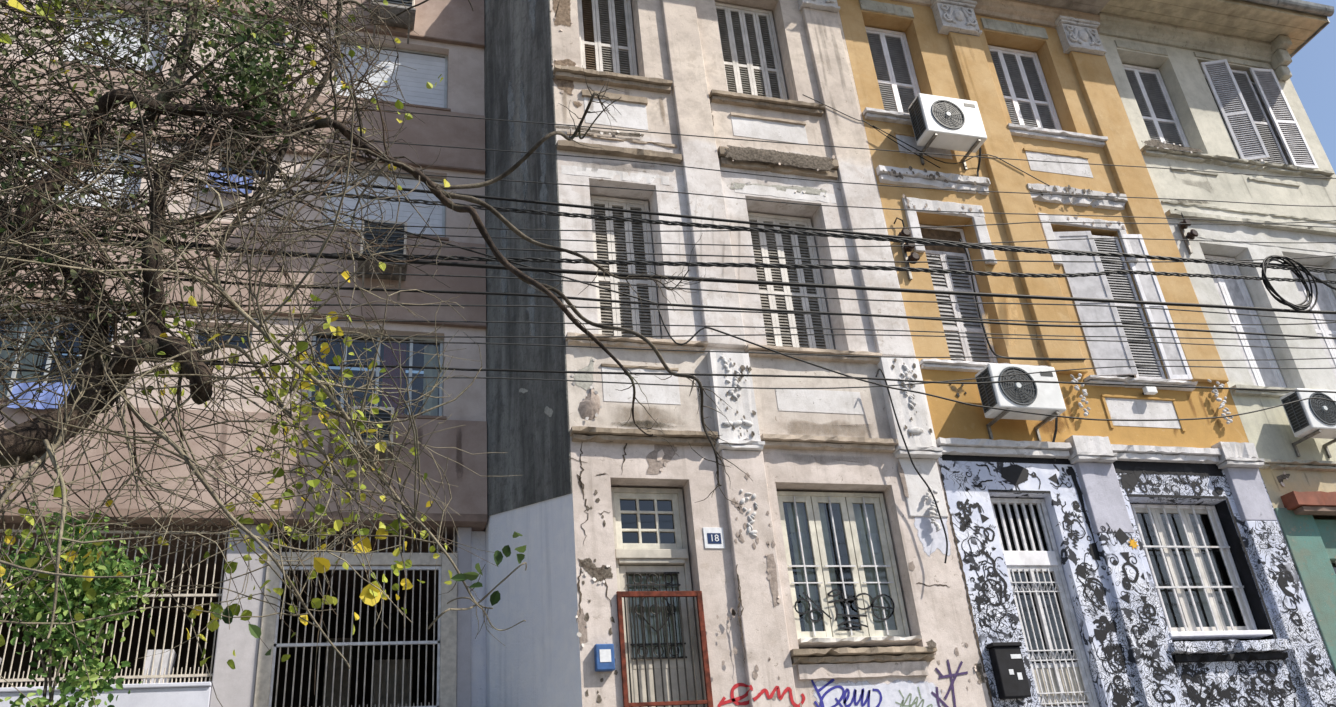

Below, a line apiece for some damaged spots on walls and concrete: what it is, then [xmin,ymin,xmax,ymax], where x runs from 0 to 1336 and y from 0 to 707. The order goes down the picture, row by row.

peeling [550,0,573,31]
flaking render [720,144,836,171]
peeling [730,181,827,197]
flaking render [646,444,677,475]
crack [570,443,627,622]
flaking render [579,558,613,585]
flaking render [575,600,591,647]